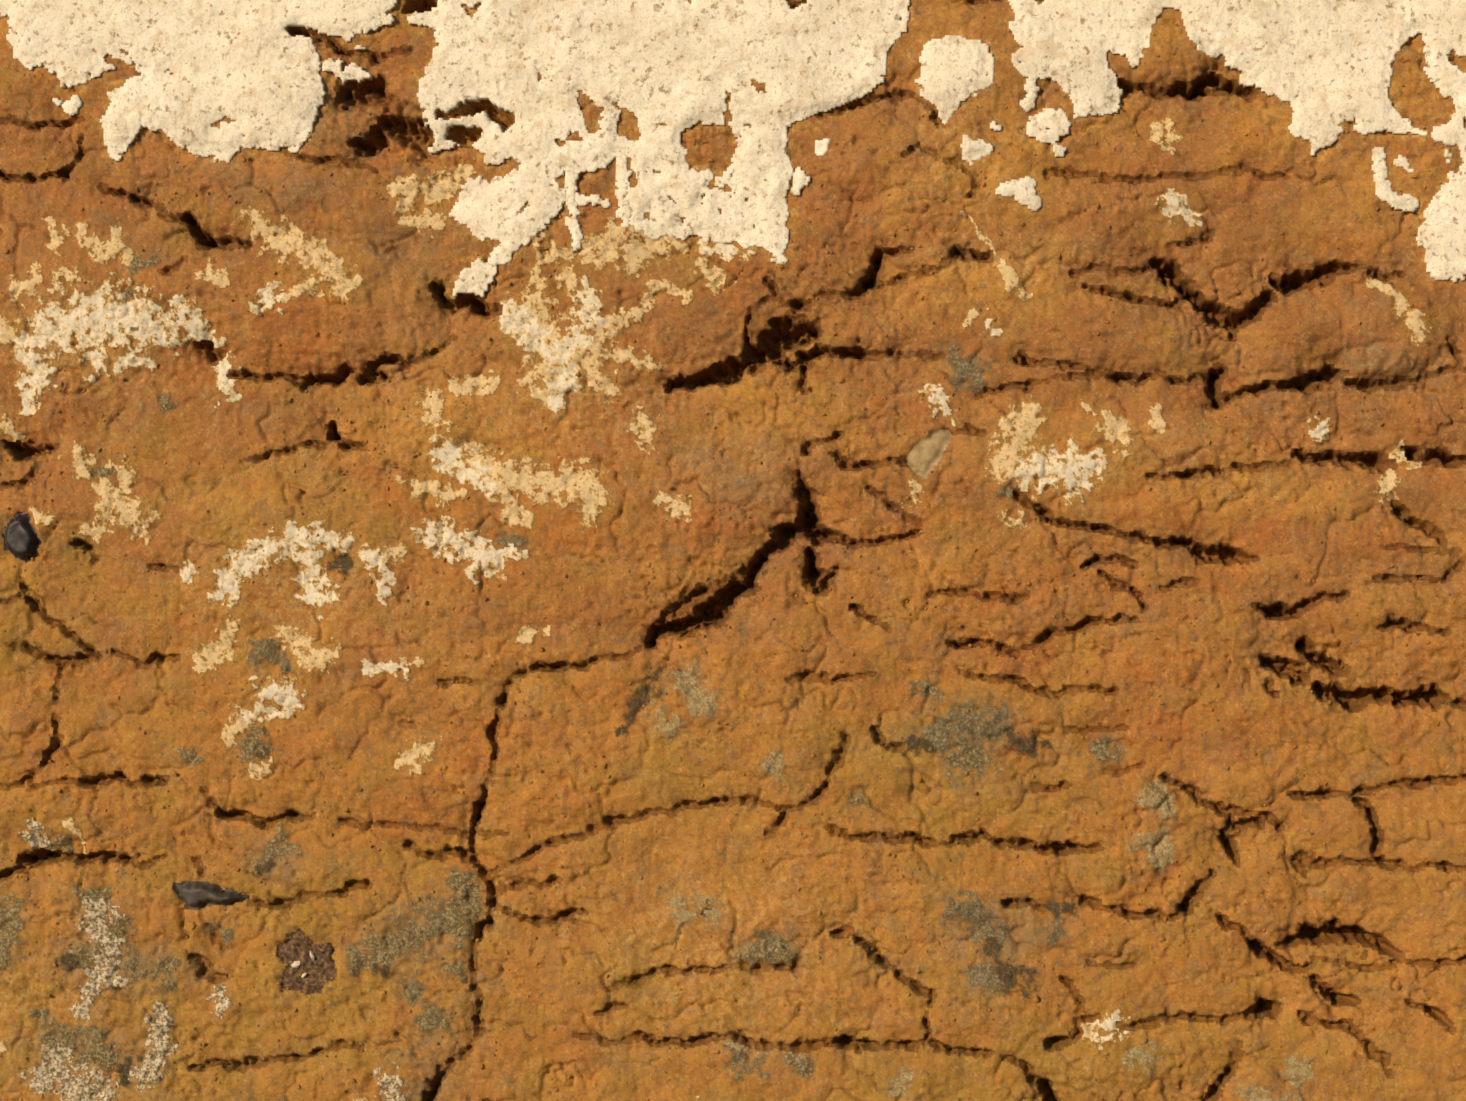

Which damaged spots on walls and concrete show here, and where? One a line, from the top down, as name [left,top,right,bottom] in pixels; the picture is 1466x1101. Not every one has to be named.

peeling [322,45,373,84]
peeling [248,214,364,315]
crack [226,277,503,464]
peeling [386,157,478,239]
crack [663,243,993,395]
peeling [960,121,1002,166]
peeling [995,176,1042,211]
crack [941,228,1466,437]
peeling [1372,147,1419,213]
crack [1145,445,1466,713]
crack [0,430,1104,1101]
crack [572,486,1466,1101]